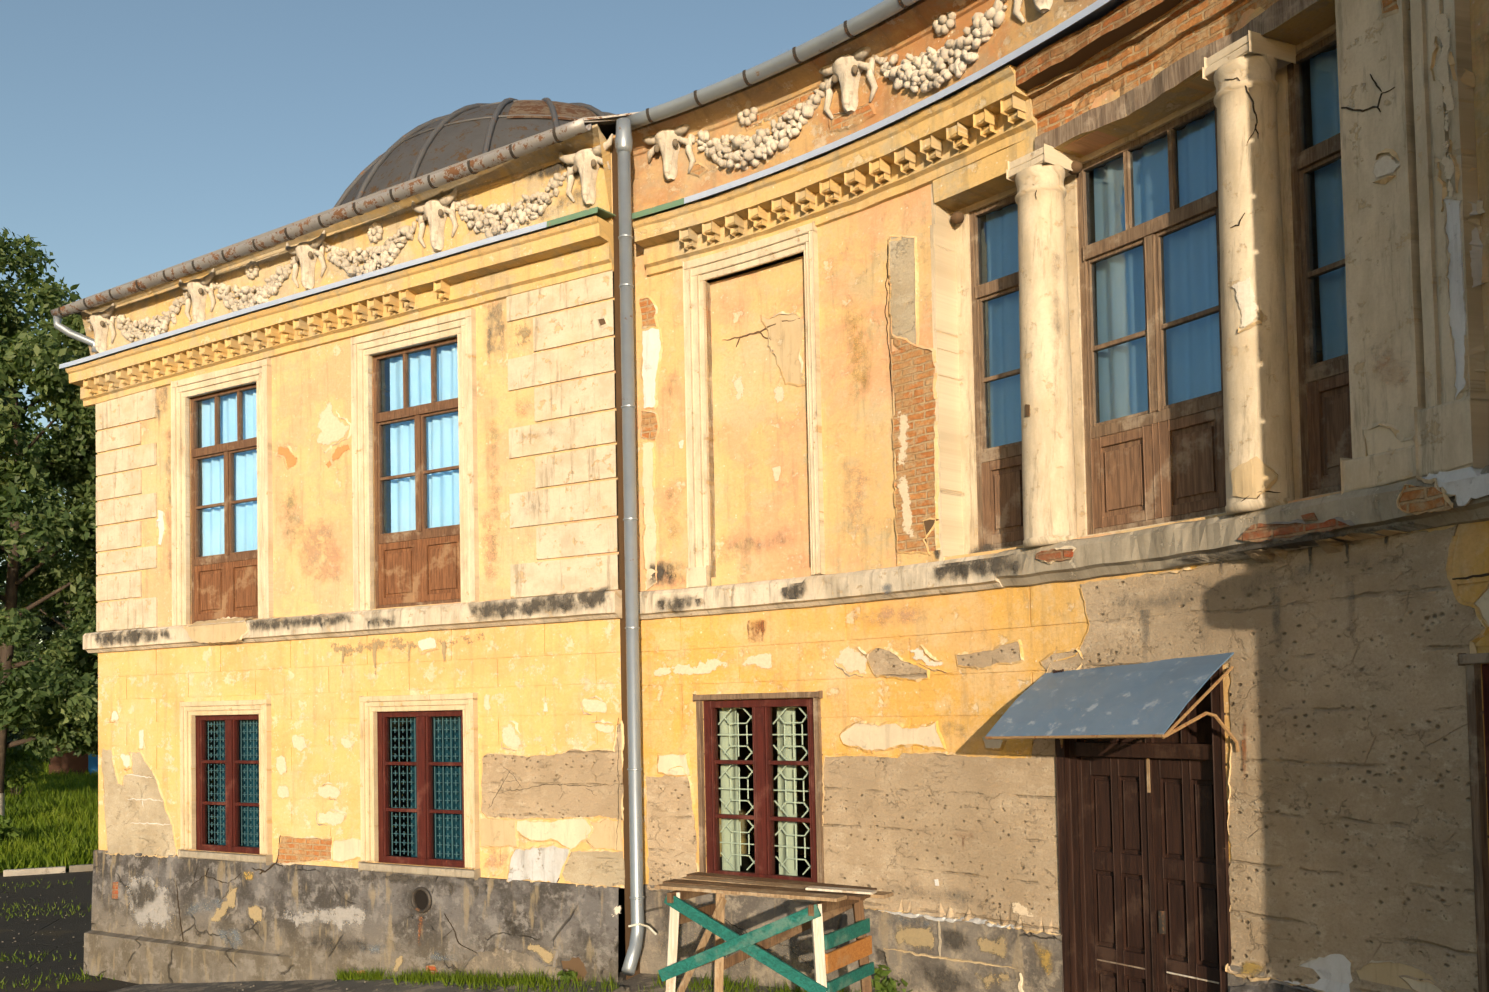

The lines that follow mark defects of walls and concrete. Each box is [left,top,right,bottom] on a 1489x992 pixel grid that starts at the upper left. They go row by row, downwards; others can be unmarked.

crack [1227,77,1259,143]
crack [1341,74,1395,112]
crack [724,318,800,347]
flaking render [888,235,940,555]
peeling [1231,456,1278,499]
crack [1452,572,1489,580]
water stain [331,620,416,674]
flaking render [822,466,1489,992]
flaking render [101,730,178,859]
flaking render [480,695,625,888]
flaking render [645,752,699,892]
crack [176,836,283,945]